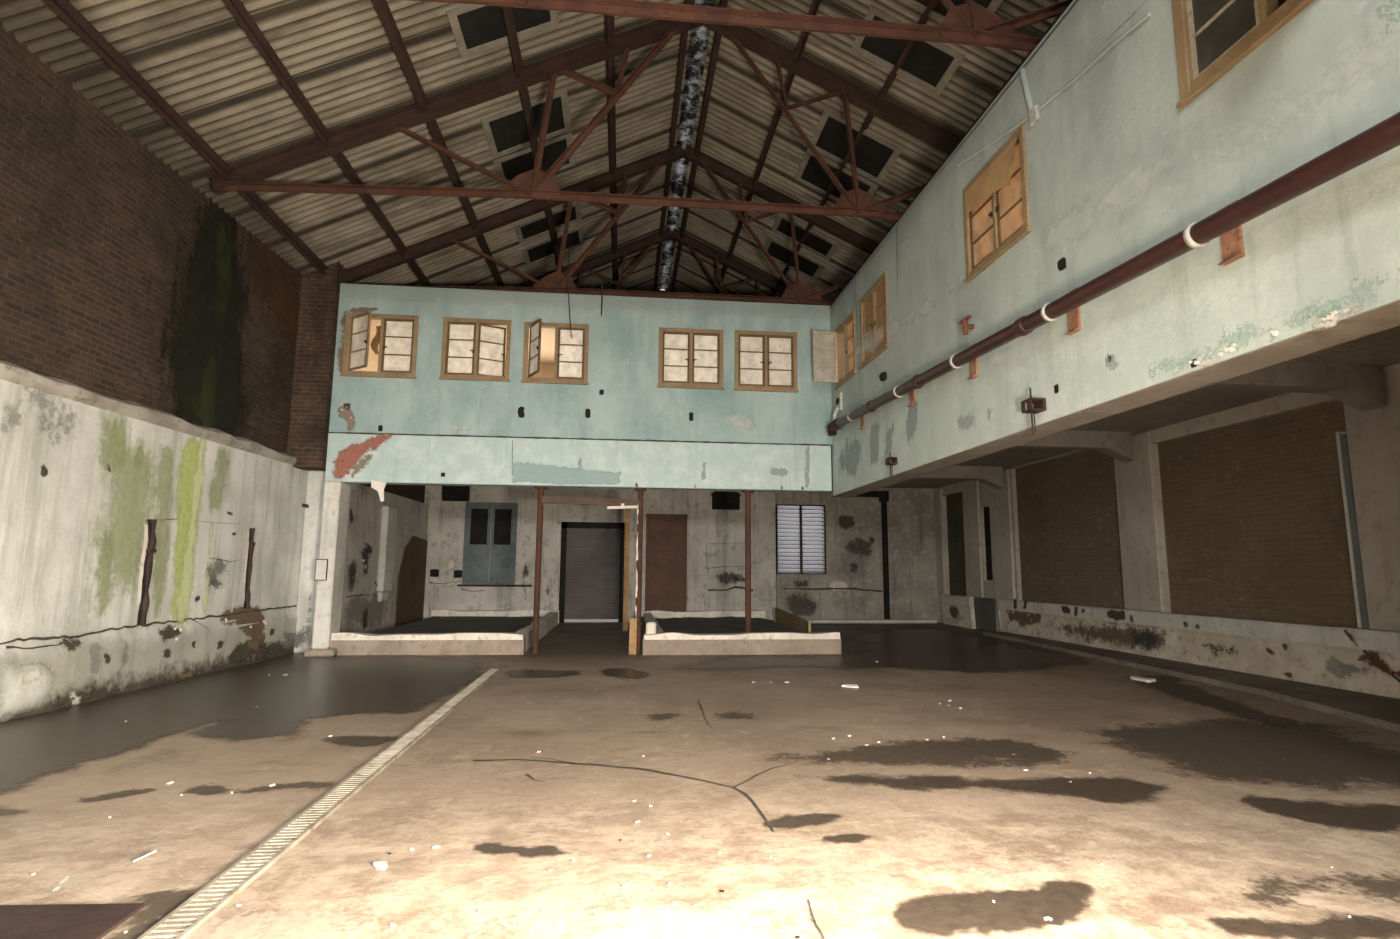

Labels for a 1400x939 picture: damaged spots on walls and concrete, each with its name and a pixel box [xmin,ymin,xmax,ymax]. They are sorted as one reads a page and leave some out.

damp [153,203,251,622]
peeling [331,403,392,502]
mould [838,515,874,573]
damp [99,543,111,612]
flaking render [59,637,83,651]
flaking render [158,624,196,658]
flaking render [217,605,282,663]
flaking render [54,688,121,709]
crack [473,757,798,832]
damp [771,737,1168,803]
damp [1095,675,1400,832]
crack [807,900,825,939]